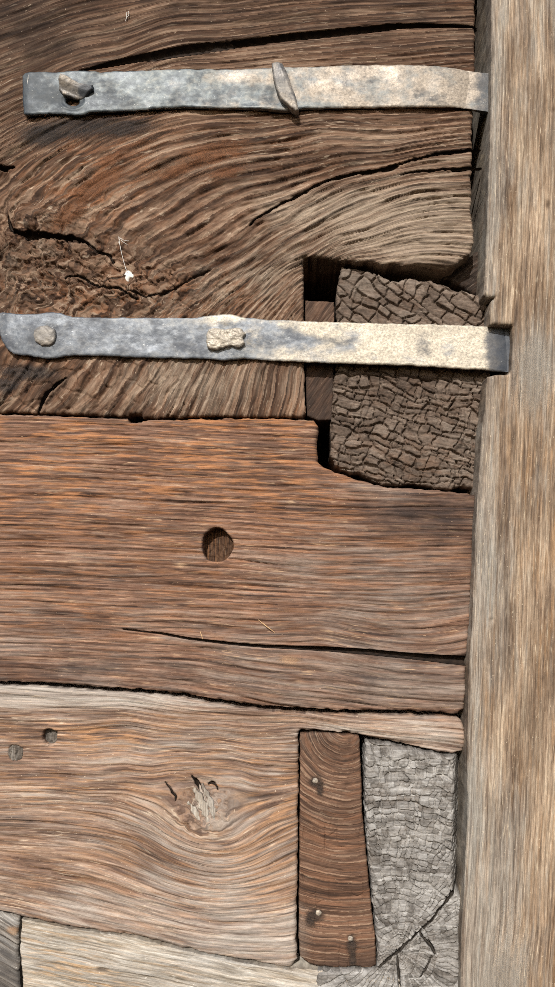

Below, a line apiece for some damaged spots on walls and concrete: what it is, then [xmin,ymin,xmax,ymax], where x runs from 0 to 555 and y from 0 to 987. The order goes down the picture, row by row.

crack [79,23,477,71]
crack [249,149,482,226]
crack [8,215,210,300]
crack [124,629,465,665]